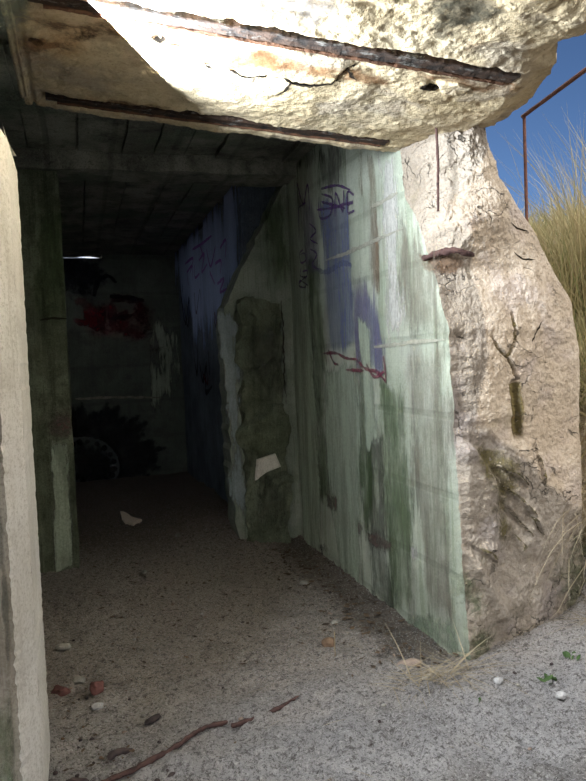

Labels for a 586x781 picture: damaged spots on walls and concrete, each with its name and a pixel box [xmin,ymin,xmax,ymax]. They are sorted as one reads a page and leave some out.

damp [430,0,502,34]
rust [18,25,388,85]
crack [150,41,356,96]
damp [378,158,407,332]
crack [493,317,542,376]
damp [287,146,393,608]
spalling [255,453,281,481]